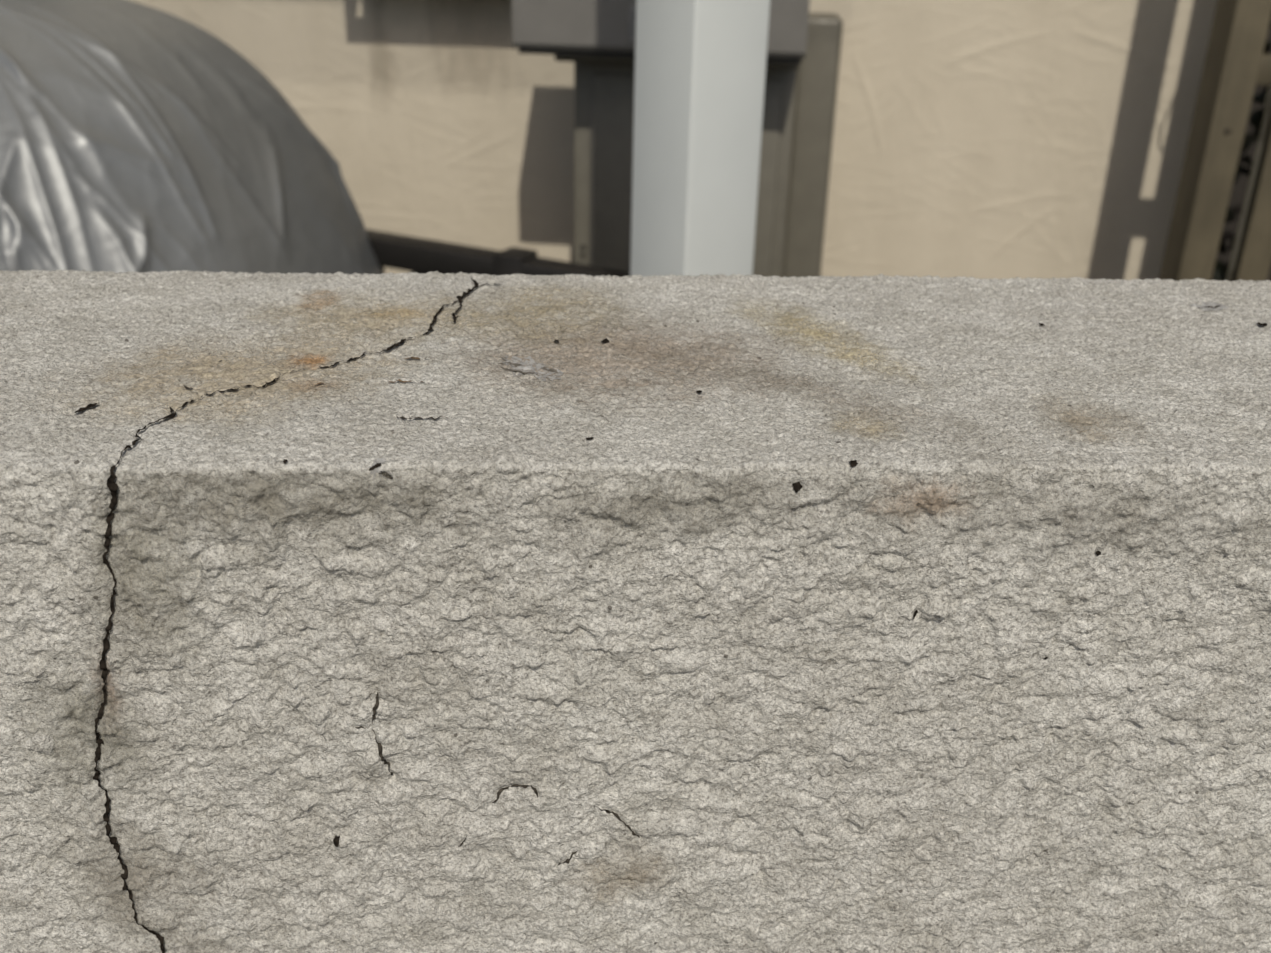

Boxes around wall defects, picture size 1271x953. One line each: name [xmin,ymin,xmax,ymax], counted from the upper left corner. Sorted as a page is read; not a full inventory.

crack [93,276,501,953]